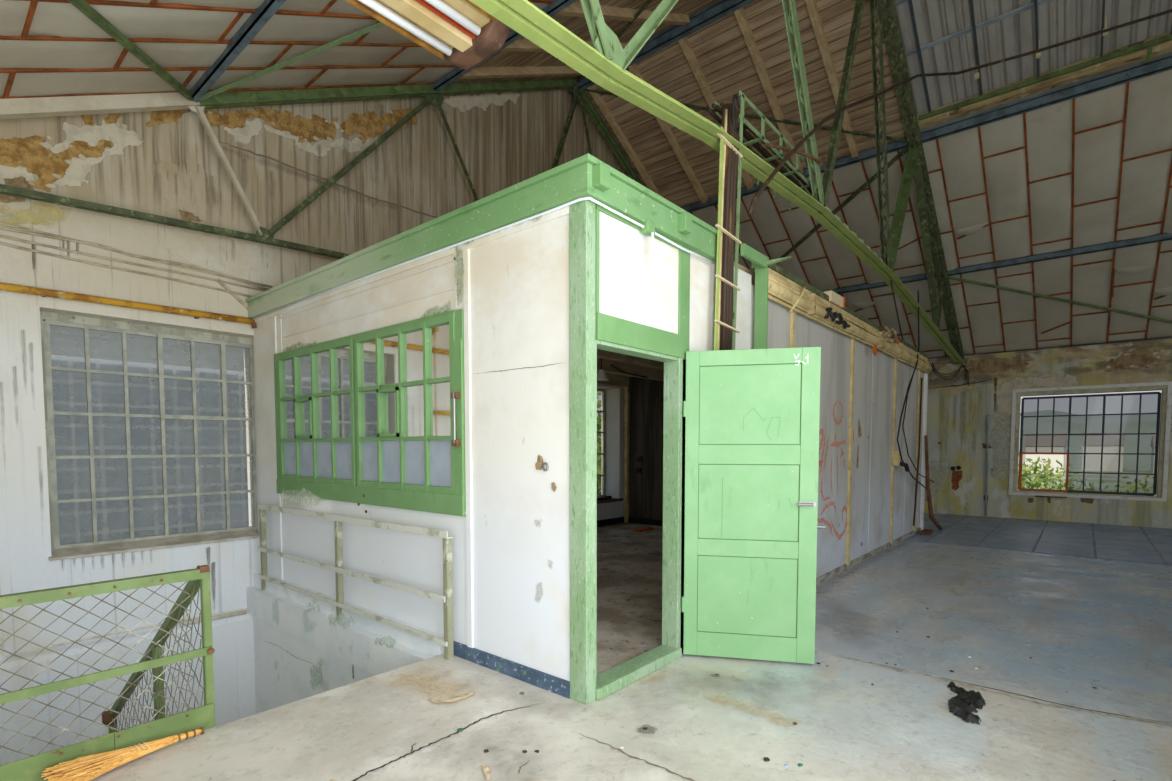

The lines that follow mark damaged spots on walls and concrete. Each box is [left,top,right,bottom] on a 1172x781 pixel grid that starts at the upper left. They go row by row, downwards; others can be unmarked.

spalling [0,109,190,216]
spalling [204,107,417,157]
crack [352,704,535,781]
crack [579,733,695,781]